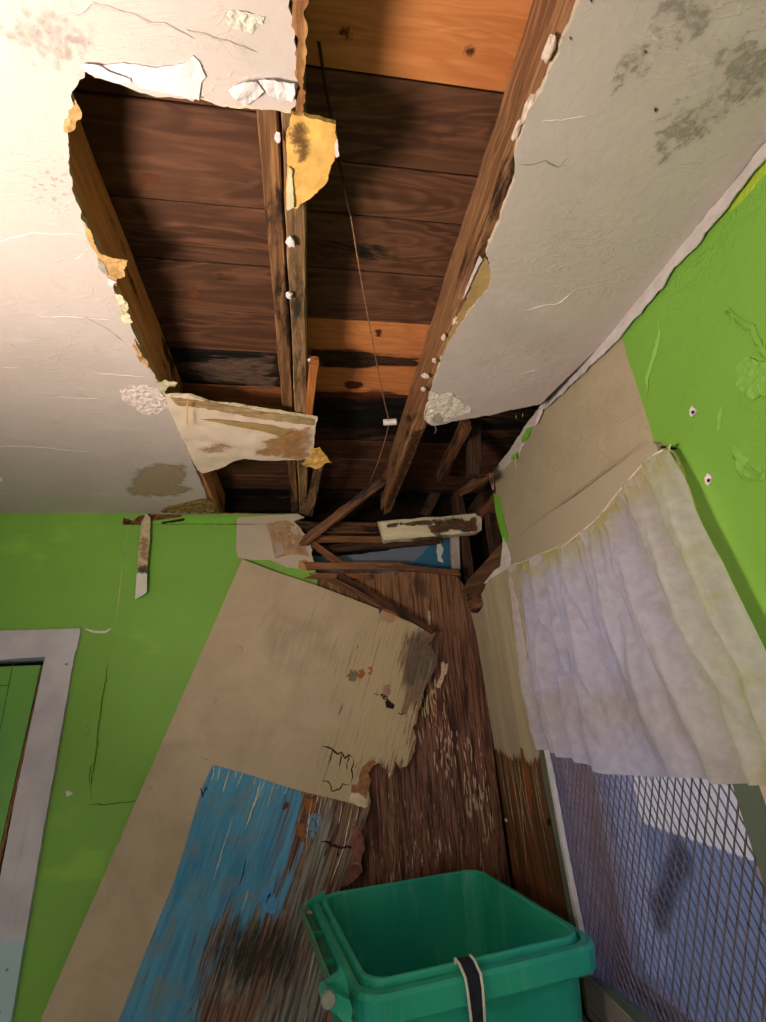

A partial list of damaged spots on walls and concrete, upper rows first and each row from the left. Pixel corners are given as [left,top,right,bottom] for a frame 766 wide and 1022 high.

peeling [80,55,206,100]
peeling [228,79,295,106]
flaking render [119,385,169,417]
peeling [426,391,471,434]
damp [128,464,189,497]
spalling [489,404,544,543]
crack [89,665,136,805]
crack [321,746,354,792]